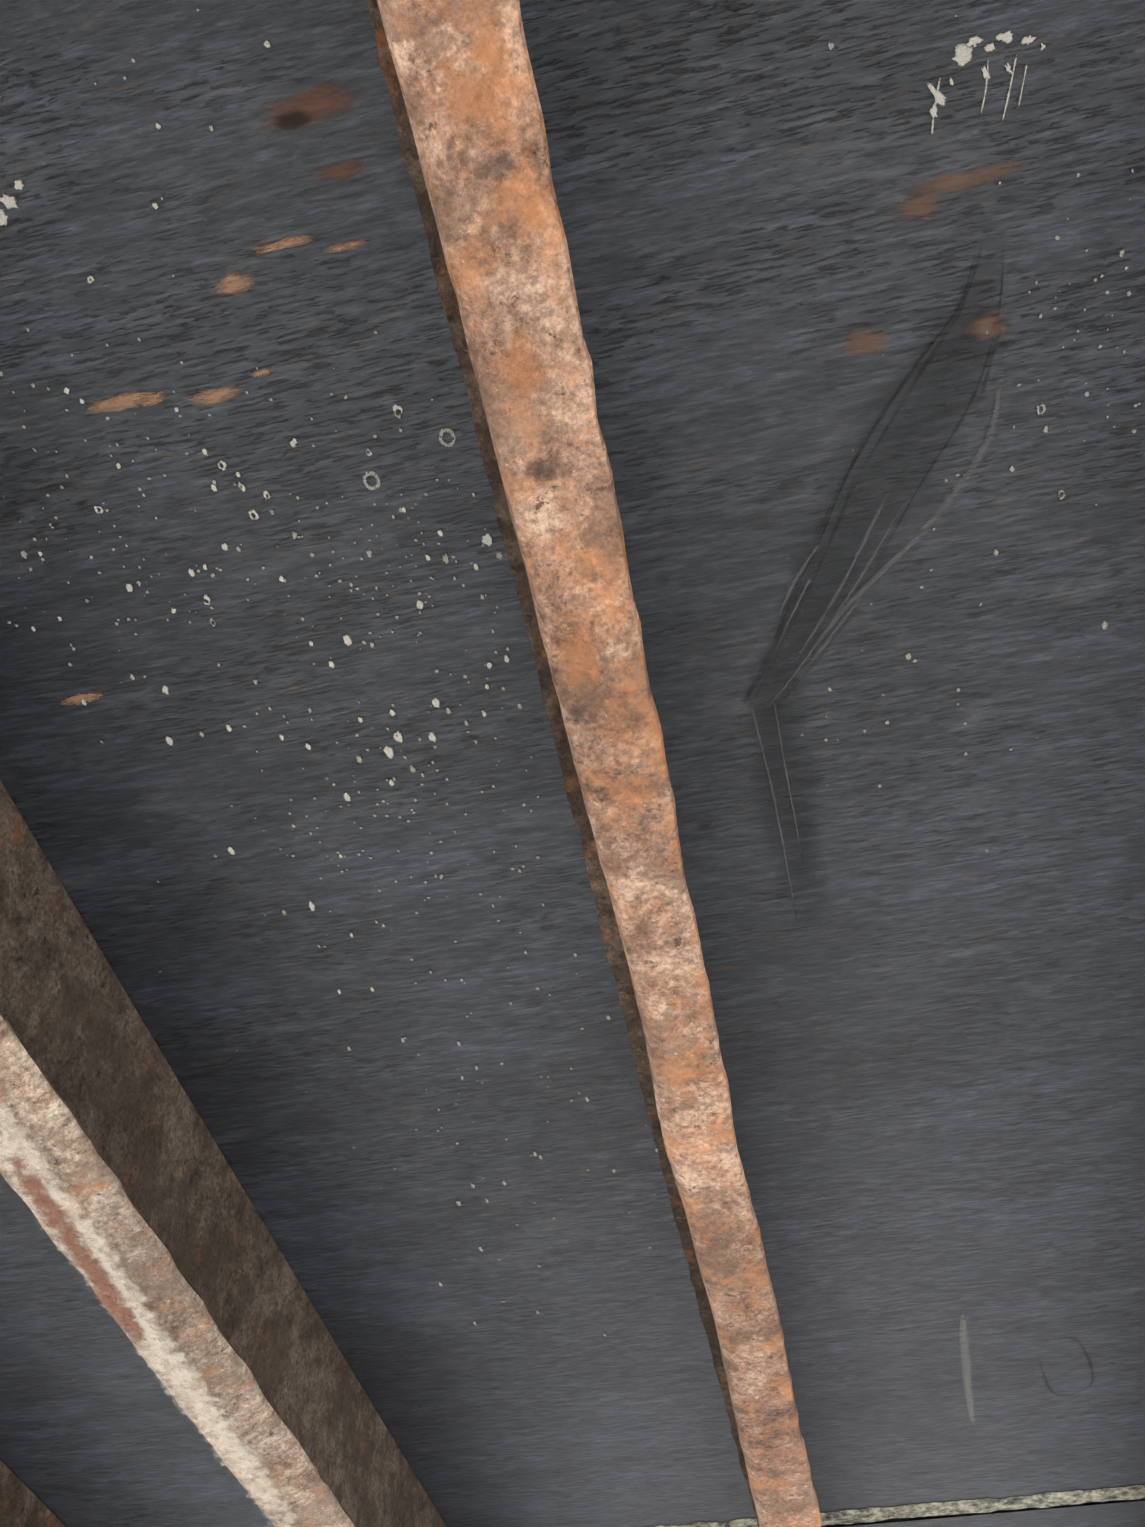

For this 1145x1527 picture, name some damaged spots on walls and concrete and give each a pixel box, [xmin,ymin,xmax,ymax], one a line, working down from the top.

leakage [1002,57,1027,122]
leakage [276,111,311,129]
rust [475,152,515,181]
rust [528,459,553,481]
rust [566,706,585,723]